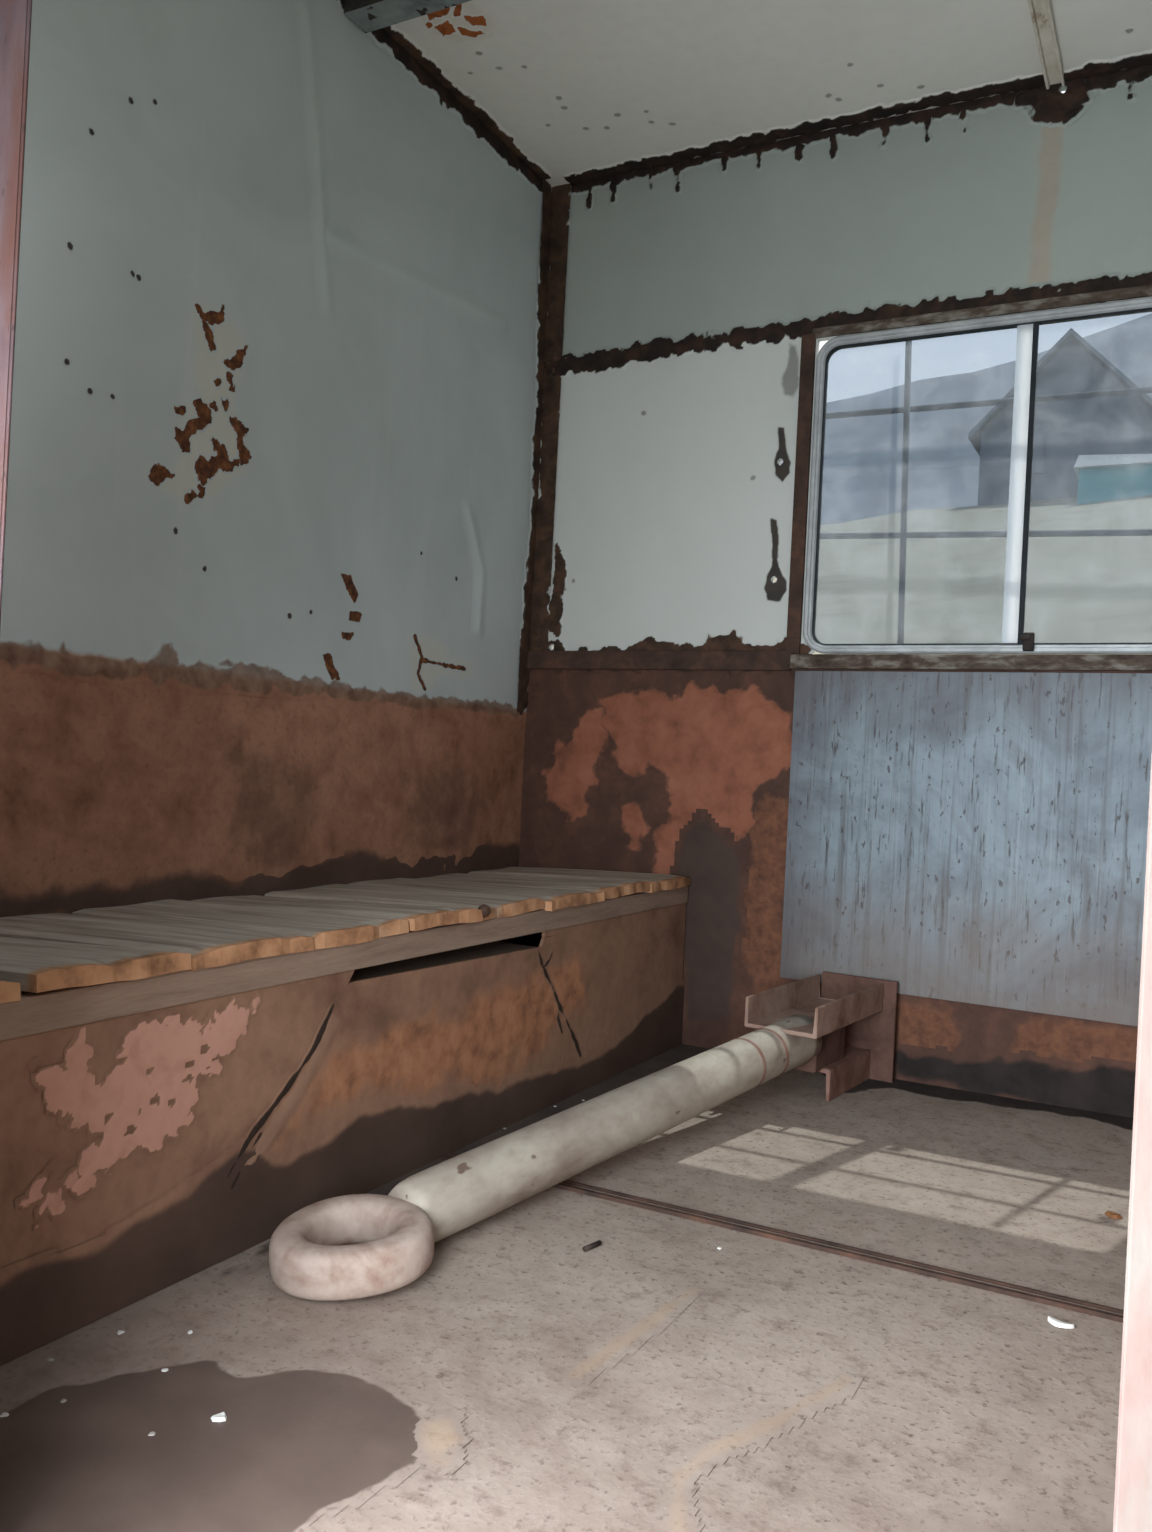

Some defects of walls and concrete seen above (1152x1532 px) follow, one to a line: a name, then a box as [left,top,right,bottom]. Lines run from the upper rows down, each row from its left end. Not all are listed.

rust [127,94,158,107]
rust [129,268,142,284]
rust [85,385,116,401]
rust [367,24,1152,716]
rust [738,783,796,1008]
peeling [15,992,263,1232]
crack [222,1000,344,1189]
rust [895,993,970,1052]
rust [1000,1009,1138,1063]
damp [0,1352,435,1532]